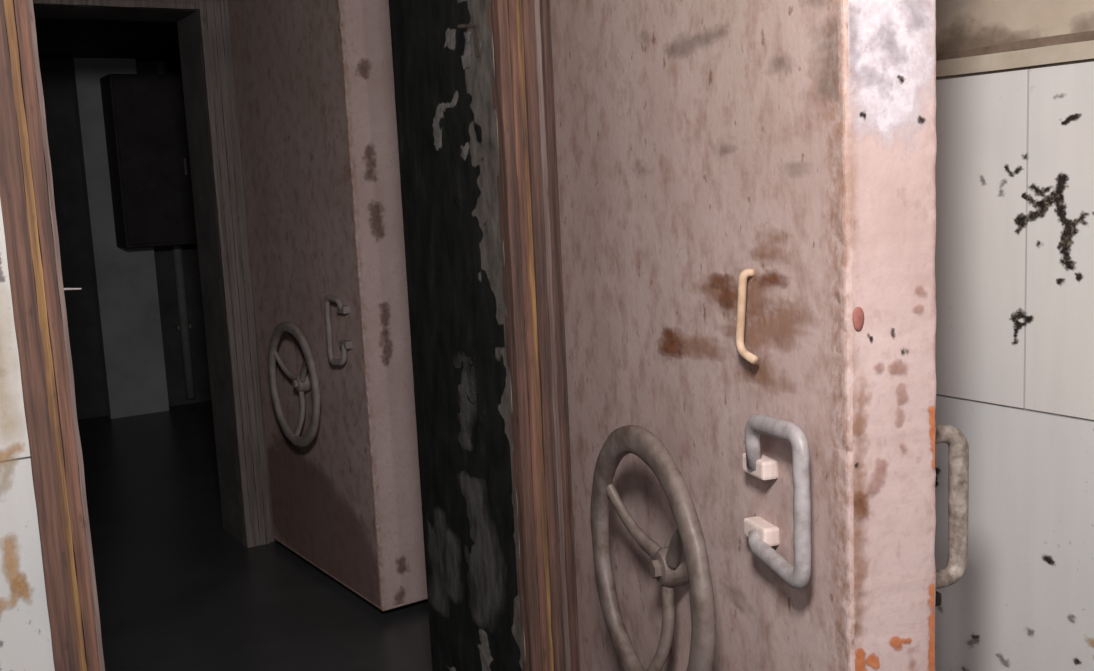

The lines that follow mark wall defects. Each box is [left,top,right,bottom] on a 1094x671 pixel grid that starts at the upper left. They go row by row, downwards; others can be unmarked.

peeling [848,0,935,137]
corrosion [0,538,29,610]
corrosion [855,648,880,671]
corrosion [890,637,911,649]